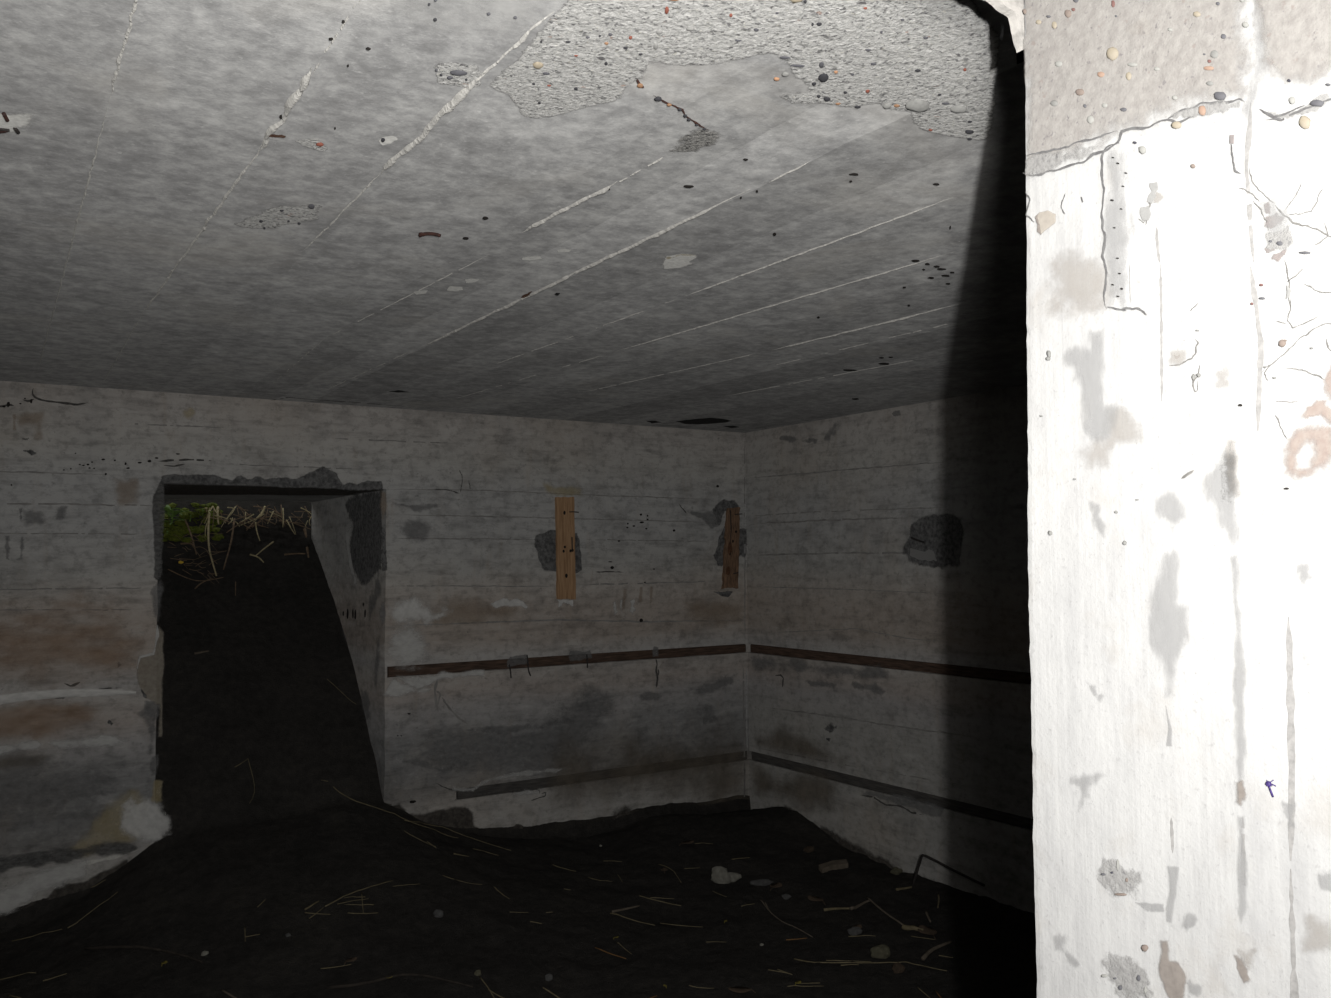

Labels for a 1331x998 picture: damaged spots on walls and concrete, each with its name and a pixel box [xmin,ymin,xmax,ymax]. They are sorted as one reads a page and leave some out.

spalling [434,0,999,140]
spalling [1023,0,1331,175]
crack [1025,98,1331,315]
crack [1231,144,1331,438]
corrosion [1286,370,1331,477]
water stain [0,735,120,754]
spalling [1099,860,1141,896]
spalling [1101,955,1151,998]